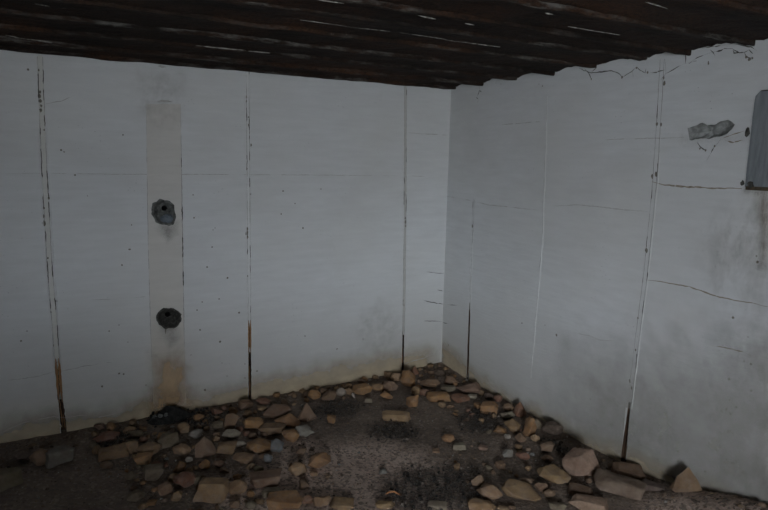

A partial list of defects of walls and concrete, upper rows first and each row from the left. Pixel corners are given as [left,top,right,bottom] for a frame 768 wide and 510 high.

crack [560,44,768,462]
spalling [688,120,743,158]